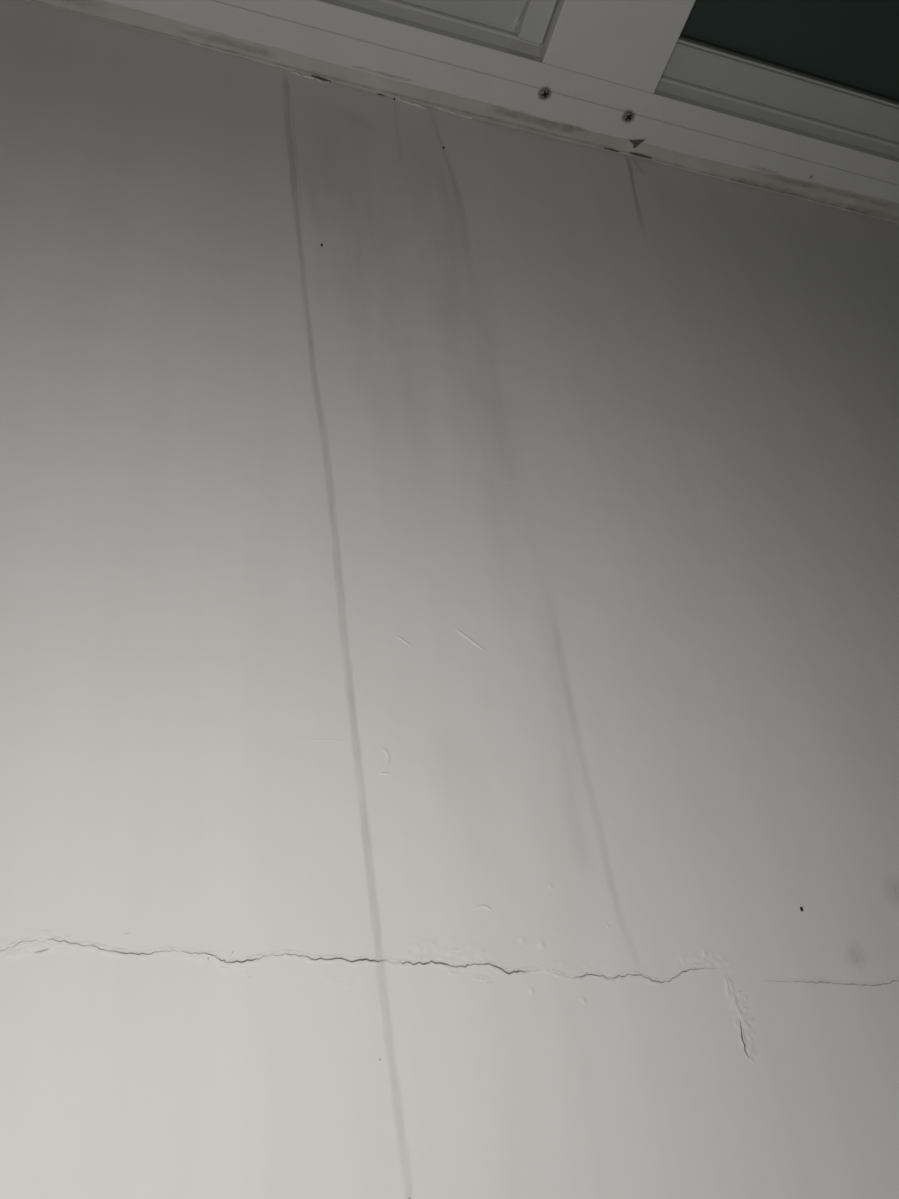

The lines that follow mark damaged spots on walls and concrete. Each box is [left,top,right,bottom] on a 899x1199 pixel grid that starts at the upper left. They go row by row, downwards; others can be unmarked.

crack [0,930,721,988]
crack [761,977,899,986]